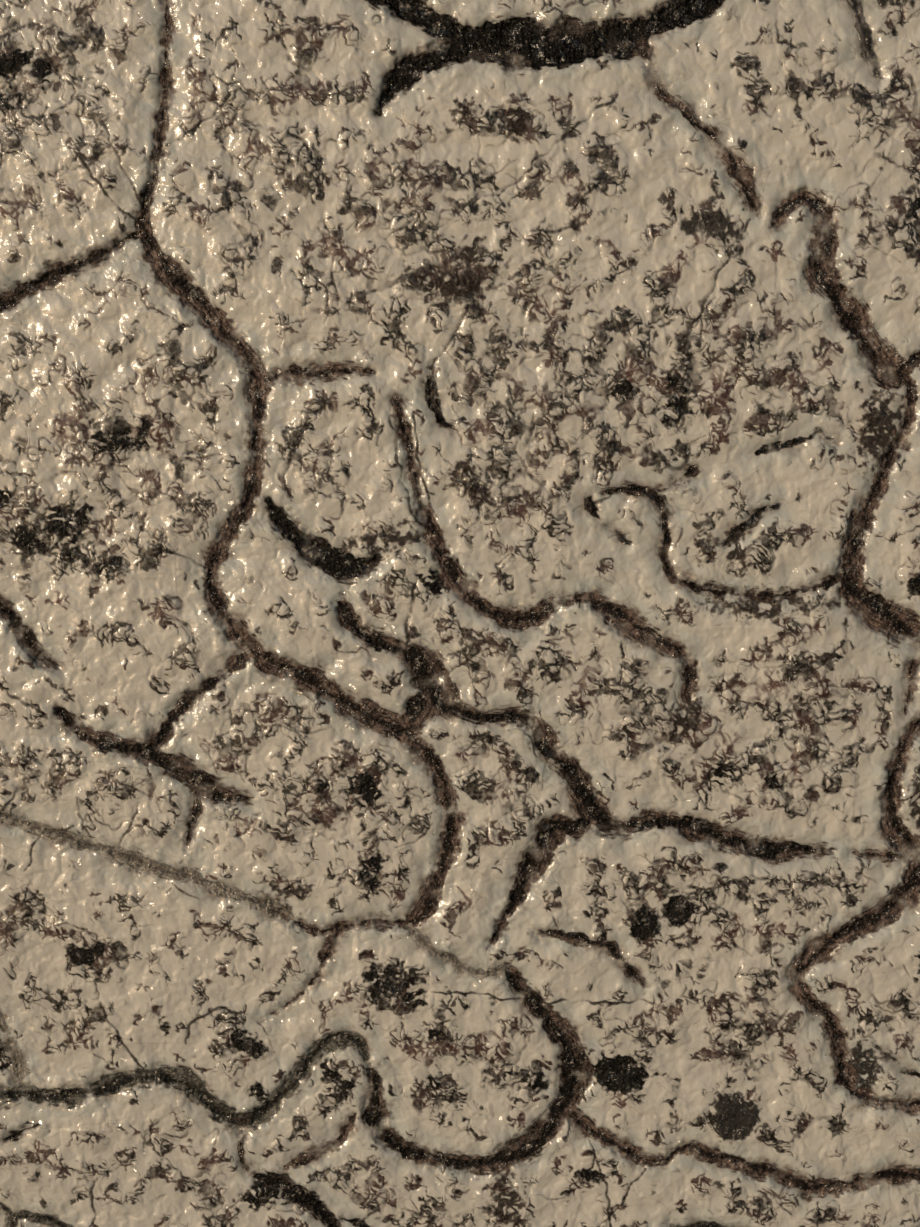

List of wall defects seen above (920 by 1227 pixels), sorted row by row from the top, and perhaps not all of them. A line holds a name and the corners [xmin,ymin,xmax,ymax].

water stain [0,47,56,115]
crack [367,0,920,666]
water stain [855,390,904,481]
crack [0,0,835,967]
water stain [10,501,130,583]
water stain [630,895,695,944]
crack [787,660,920,1116]
crack [0,923,920,1202]
water stain [591,1054,649,1094]
water stain [709,1092,760,1140]
crack [0,1181,95,1227]
crack [253,1113,368,1227]